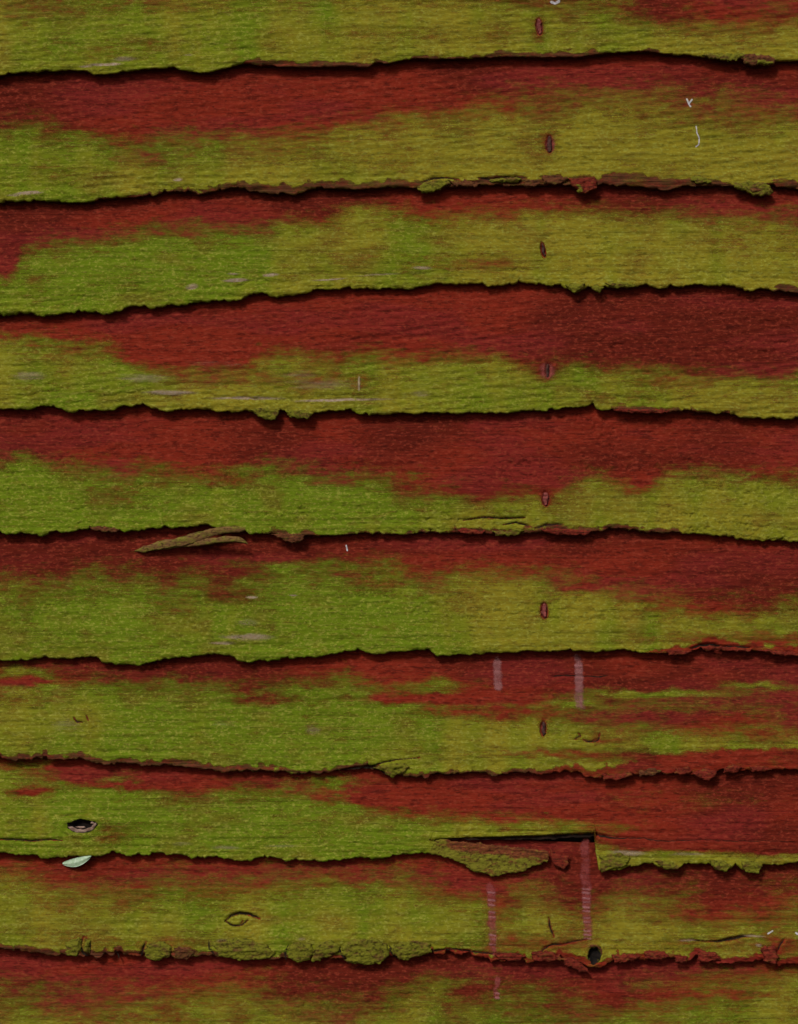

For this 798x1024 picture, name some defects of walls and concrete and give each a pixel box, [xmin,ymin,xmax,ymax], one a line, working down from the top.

peeling [417,175,597,194]
spalling [733,181,773,196]
crack [465,516,563,529]
crack [432,833,793,842]
peeling [494,951,589,973]
peeling [611,950,721,963]